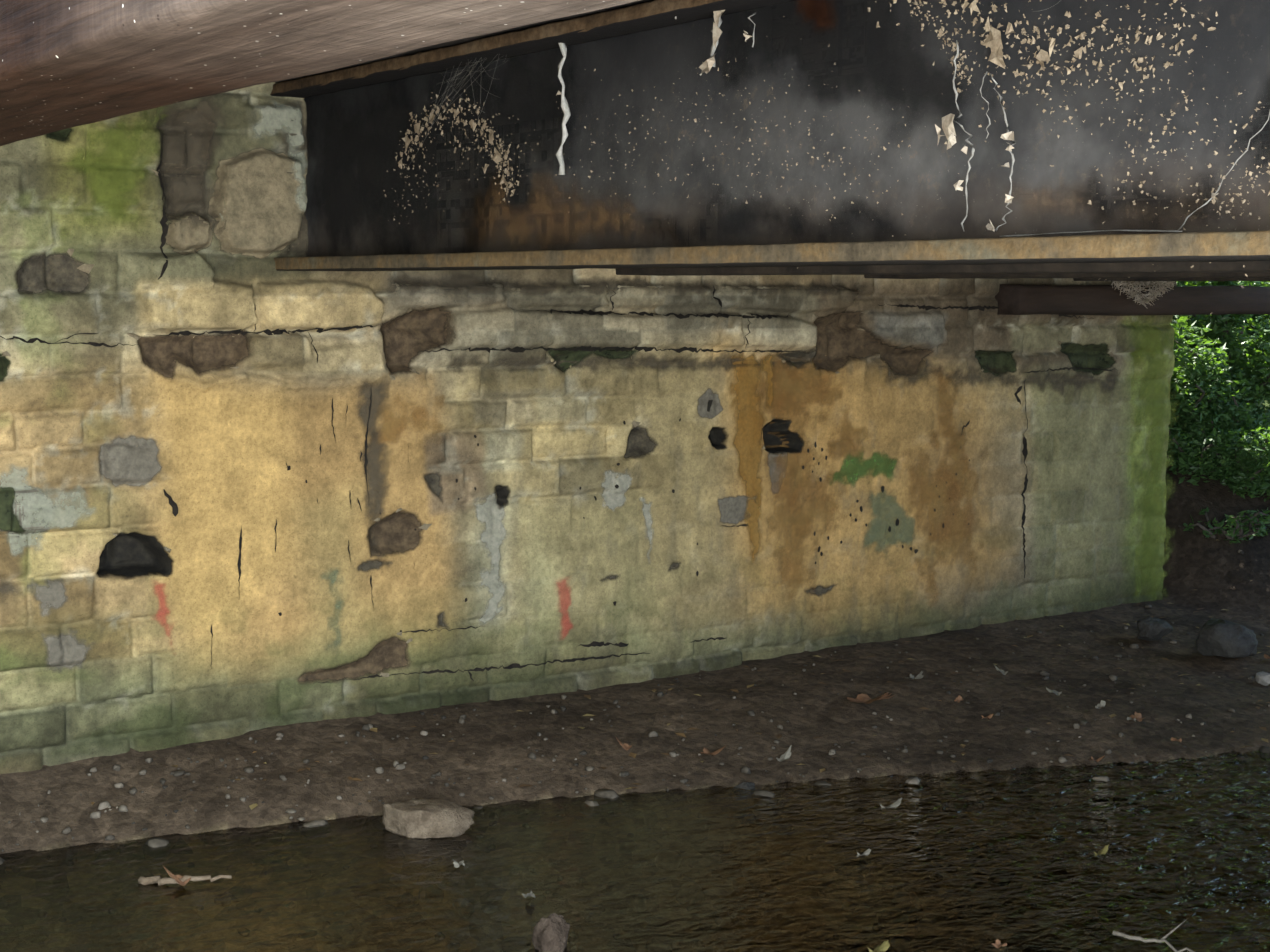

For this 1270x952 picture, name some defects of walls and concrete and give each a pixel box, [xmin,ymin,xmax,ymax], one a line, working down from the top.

peeling [867,0,1270,230]
peeling [383,89,539,224]
spalling [15,249,95,295]
crack [0,284,375,363]
spalling [126,330,250,379]
spalling [777,310,933,376]
crack [879,303,999,311]
damp [359,383,387,546]
corrosion [731,354,774,561]
crack [1014,366,1120,578]
spalling [358,508,432,571]
spalling [298,630,413,683]